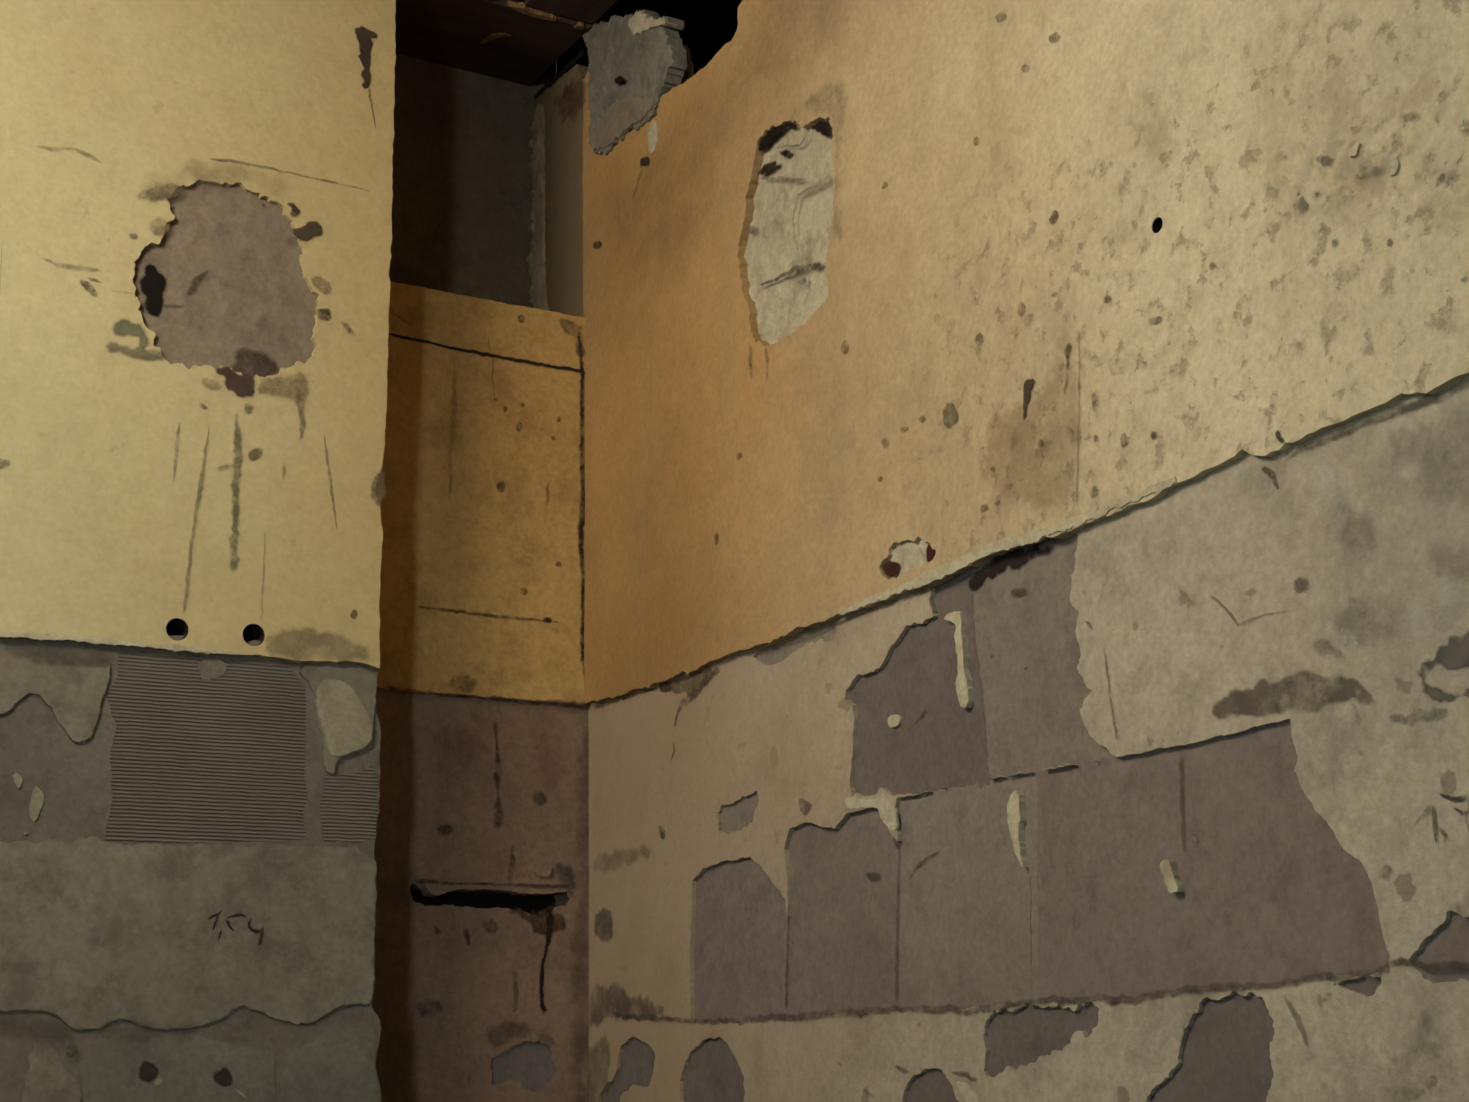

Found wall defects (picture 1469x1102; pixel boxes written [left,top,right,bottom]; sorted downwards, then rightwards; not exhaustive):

spalling [288,203,322,241]
spalling [744,120,835,367]
peeling [108,319,165,360]
spalling [216,367,307,401]
crack [1293,385,1464,456]
damp [194,406,262,569]
spalling [756,620,838,665]
peeling [316,680,373,757]
spalling [844,534,1390,1102]
crack [539,905,553,1012]
spalling [683,858,794,1102]
crack [616,958,1469,1024]